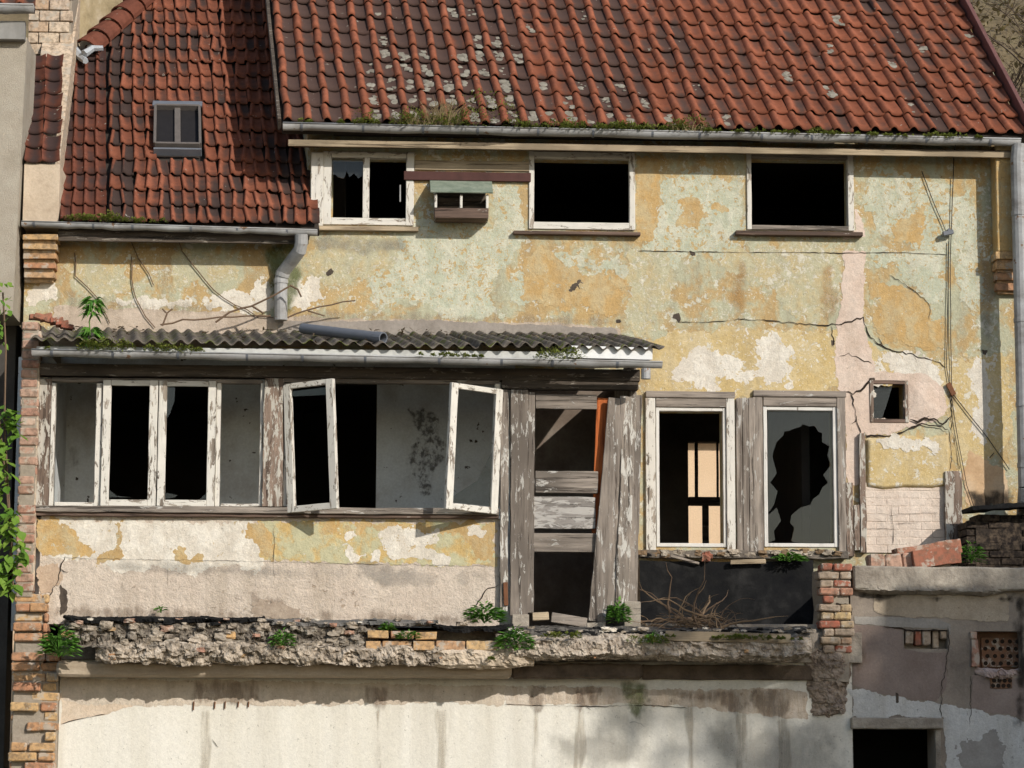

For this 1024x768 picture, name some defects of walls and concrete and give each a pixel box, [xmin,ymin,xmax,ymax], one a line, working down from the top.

peeling [26,249,274,315]
peeling [552,154,842,401]
crack [643,250,948,315]
peeling [861,160,1013,474]
crack [677,317,960,471]
leakage [408,409,444,495]
peeling [36,516,499,615]
crack [886,627,972,725]
flaking render [836,603,1024,768]